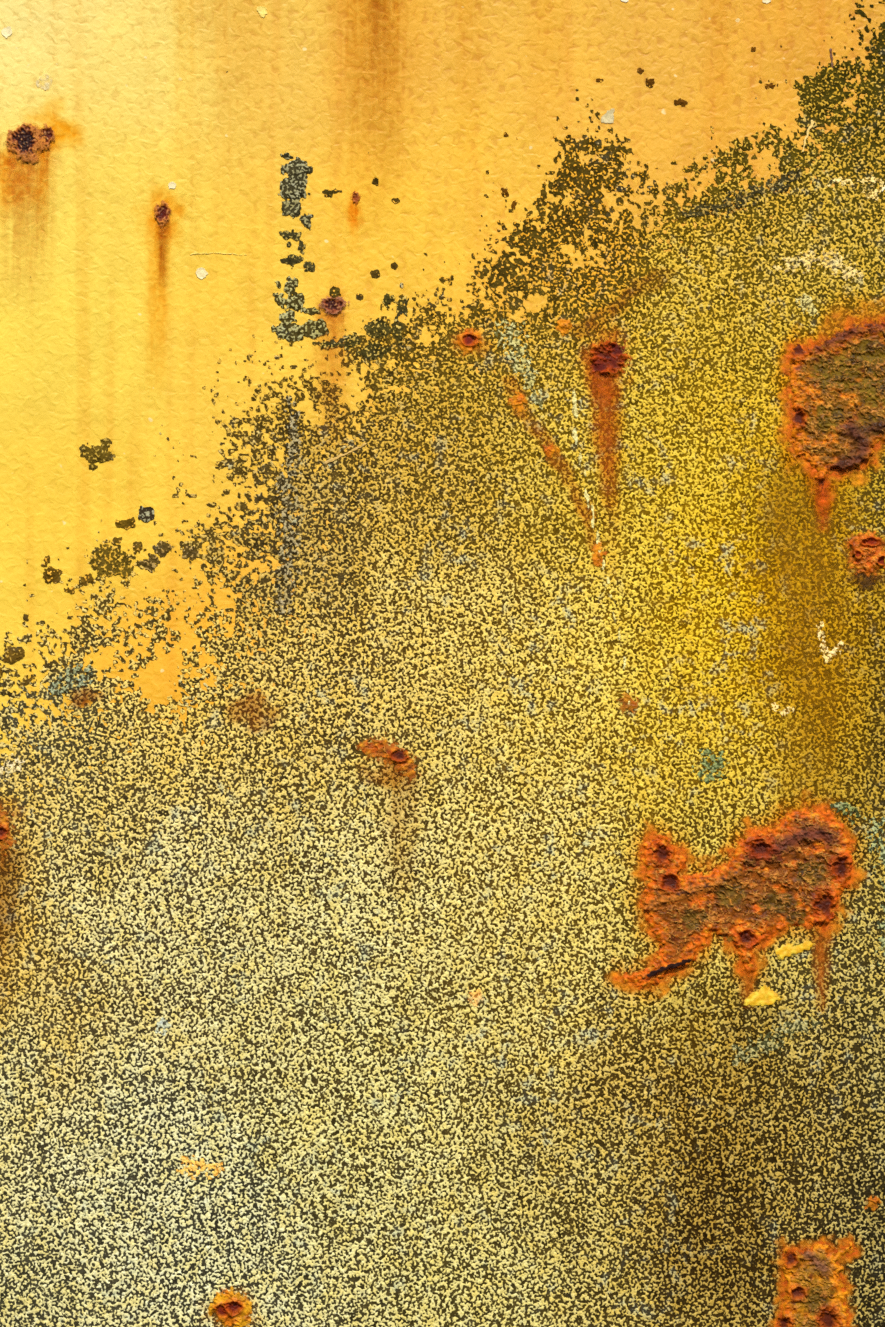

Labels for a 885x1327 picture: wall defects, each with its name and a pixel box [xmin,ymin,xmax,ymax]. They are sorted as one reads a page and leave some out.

rust [5,122,55,164]
rust [154,200,171,231]
rust [589,338,631,391]
rust [778,311,885,510]
rust [846,529,885,588]
rust [356,736,421,780]
rust [0,805,16,855]
rust [611,803,866,1006]
rust [208,1286,253,1327]
rust [772,1236,860,1327]